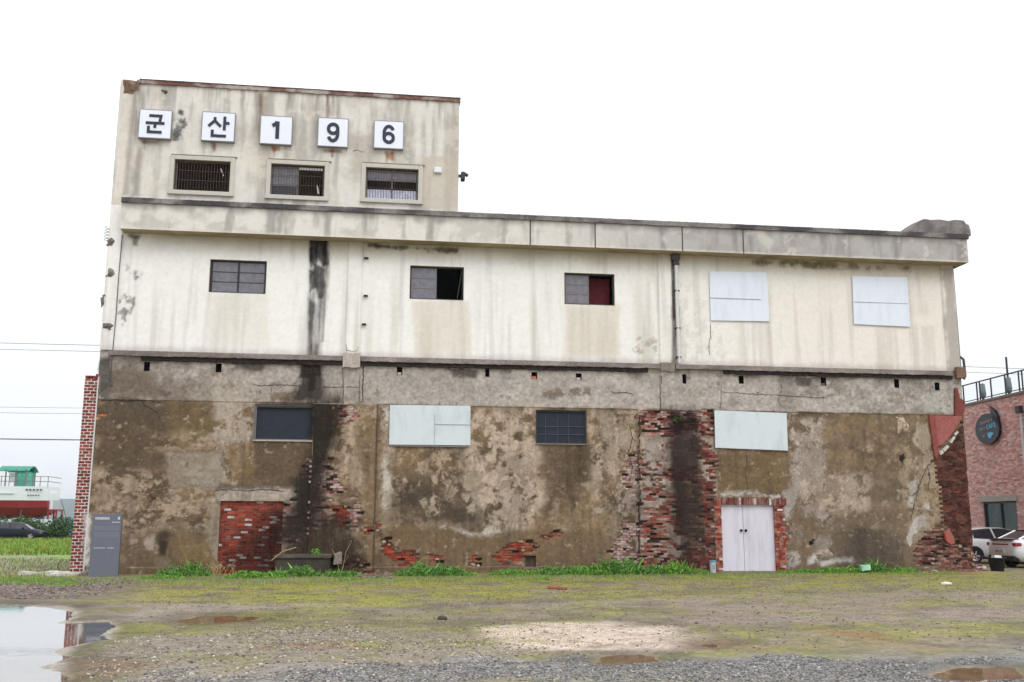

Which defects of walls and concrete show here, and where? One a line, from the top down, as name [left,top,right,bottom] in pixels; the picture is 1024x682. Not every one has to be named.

water stain [158,532,168,555]
water stain [242,240,357,570]
flaking render [282,457,443,566]
flaking render [492,533,563,566]
water stain [671,413,702,565]
flaking render [590,410,871,570]
crack [910,458,935,519]
flaking render [898,388,976,571]